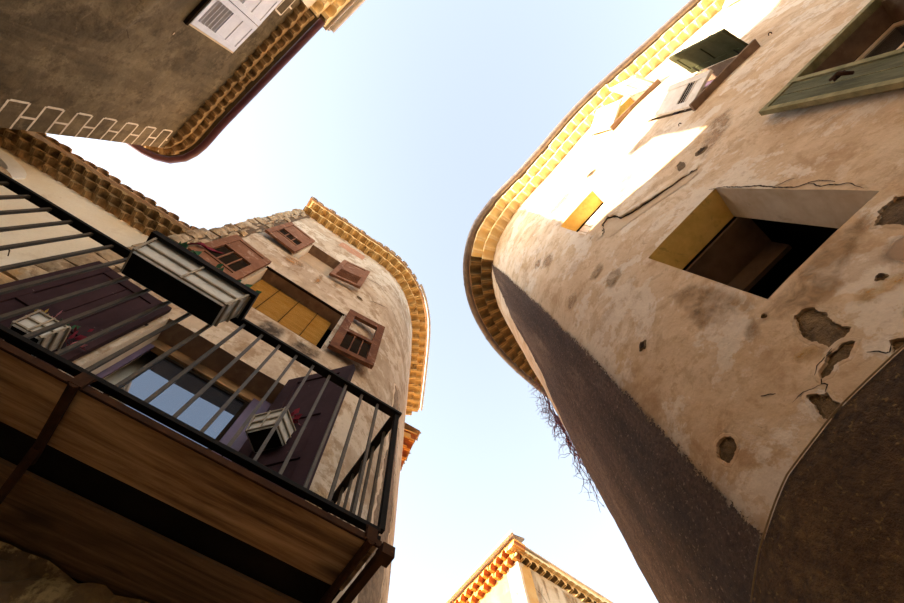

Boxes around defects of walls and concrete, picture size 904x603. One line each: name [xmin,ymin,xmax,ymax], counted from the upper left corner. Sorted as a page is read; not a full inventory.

crack [709,178,862,190]
flaking render [869,193,904,230]
flaking render [789,304,861,424]
flaking render [884,334,904,360]
flaking render [713,433,740,468]